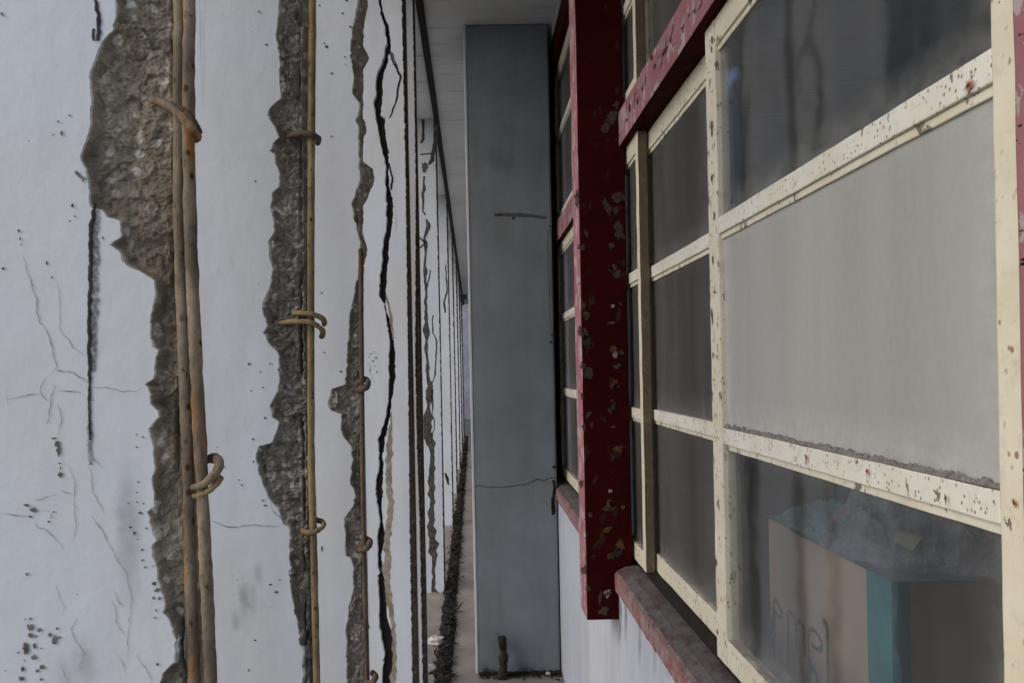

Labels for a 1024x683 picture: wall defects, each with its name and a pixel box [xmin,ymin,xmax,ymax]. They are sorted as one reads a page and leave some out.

crack [92,0,101,41]
peeling [600,0,701,137]
crack [27,204,96,478]
spalling [75,0,217,683]
spalling [248,0,328,683]
spalling [329,0,375,683]
crack [374,0,402,683]
peeling [578,302,592,347]
peeling [607,345,624,428]
crack [13,504,55,523]
crack [476,477,555,488]
peeling [581,565,611,616]